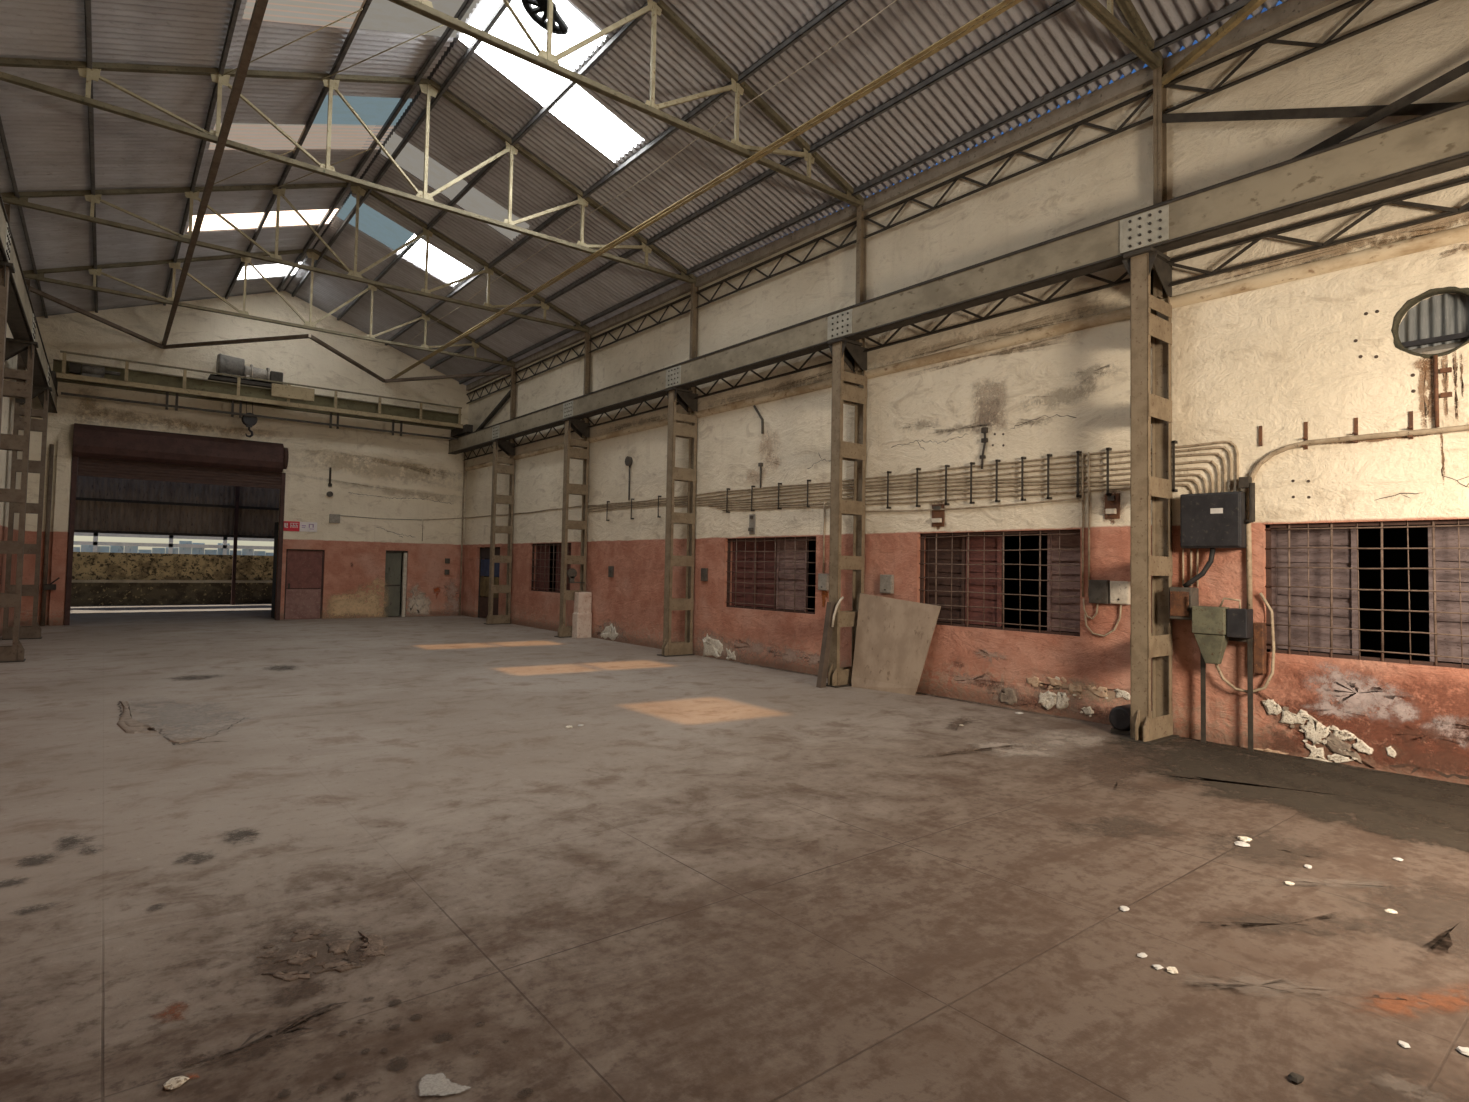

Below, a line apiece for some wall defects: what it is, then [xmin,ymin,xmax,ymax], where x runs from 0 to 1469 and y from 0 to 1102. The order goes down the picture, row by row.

corrosion [1326,355,1464,480]
spalling [117,701,206,744]
peeling [990,676,1131,717]
peeling [1253,665,1469,764]
spalling [256,927,387,982]